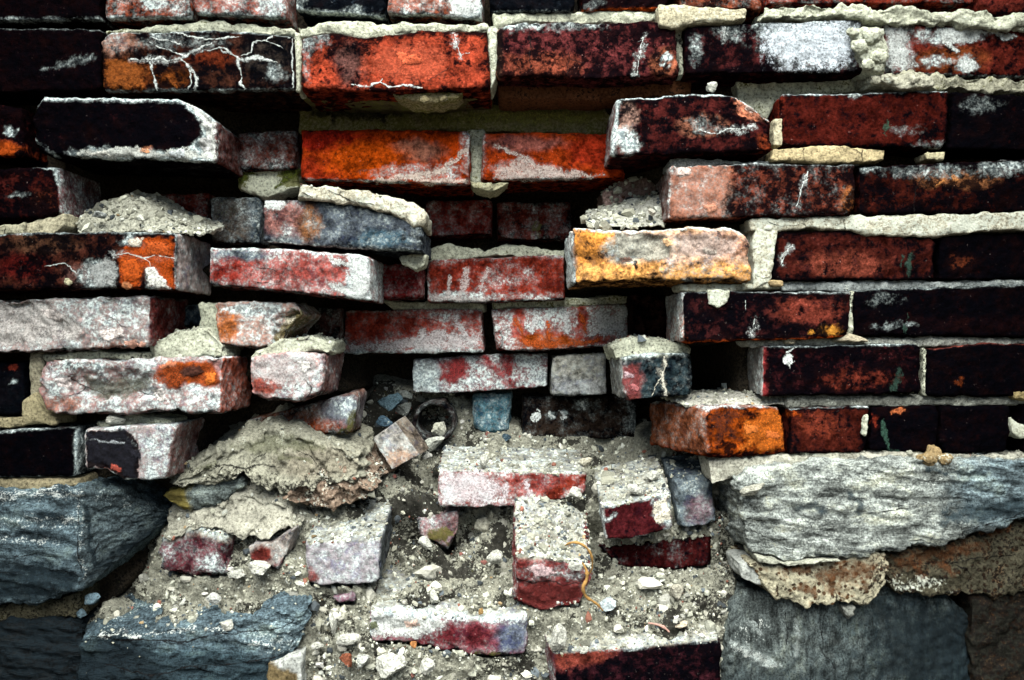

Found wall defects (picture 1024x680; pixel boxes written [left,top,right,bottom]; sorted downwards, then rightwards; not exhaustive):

crack [130,32,294,91]
leakage [760,21,856,71]
crack [112,253,175,267]
peeling [622,368,640,395]
spalling [376,390,413,427]
peeling [653,497,671,523]
spalling [516,564,582,609]
spalling [370,613,446,639]